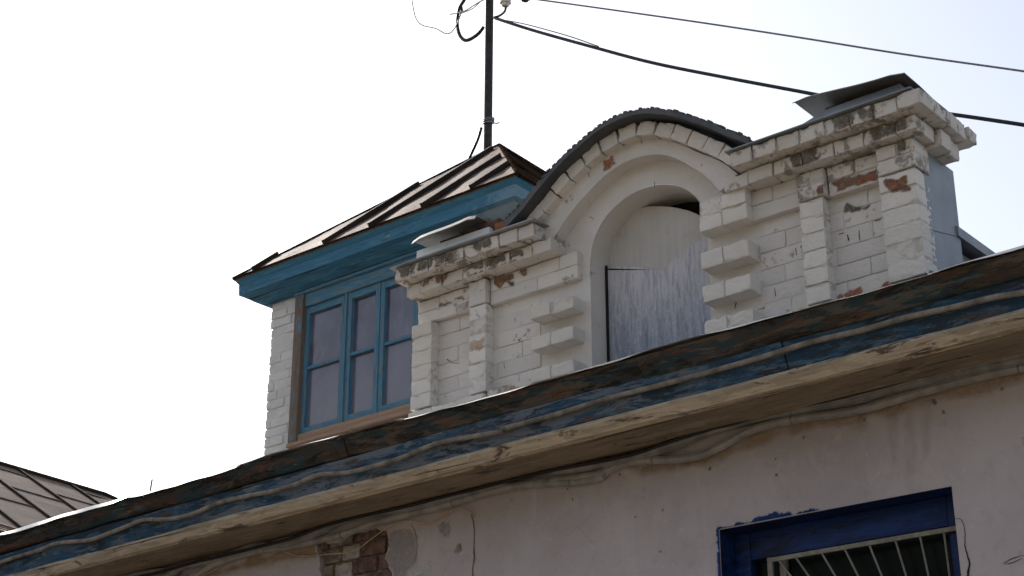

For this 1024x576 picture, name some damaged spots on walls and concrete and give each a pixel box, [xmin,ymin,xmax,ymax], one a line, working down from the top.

peeling [804,170,911,199]
peeling [844,203,870,213]
peeling [399,252,453,287]
peeling [467,238,527,288]
peeling [837,287,862,299]
flaking render [319,529,392,576]